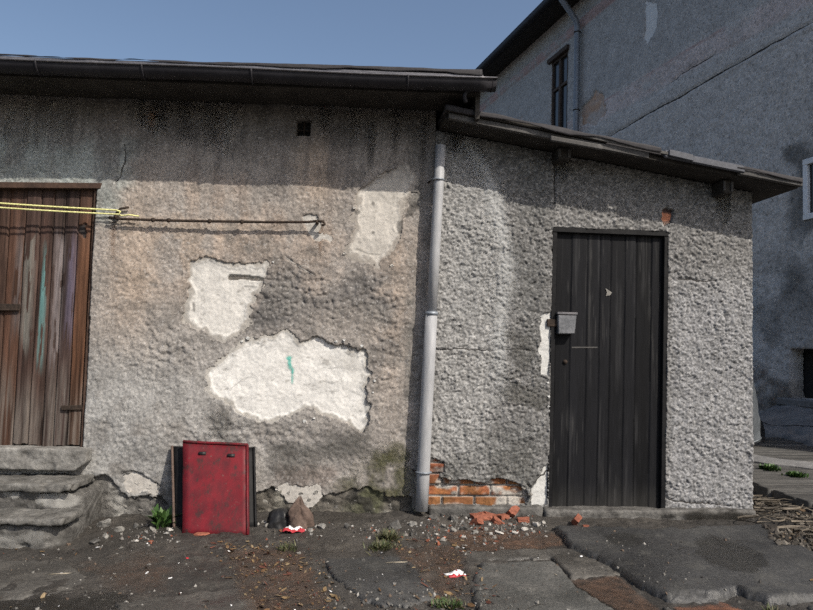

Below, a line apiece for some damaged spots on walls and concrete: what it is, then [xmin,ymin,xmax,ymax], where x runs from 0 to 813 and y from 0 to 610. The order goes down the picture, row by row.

peeling [644,1,658,44]
crack [609,22,813,137]
peeling [340,164,419,270]
peeling [182,256,376,432]
peeling [538,312,551,383]
spalling [91,471,169,517]
spalling [256,482,413,514]
spalling [428,457,547,506]